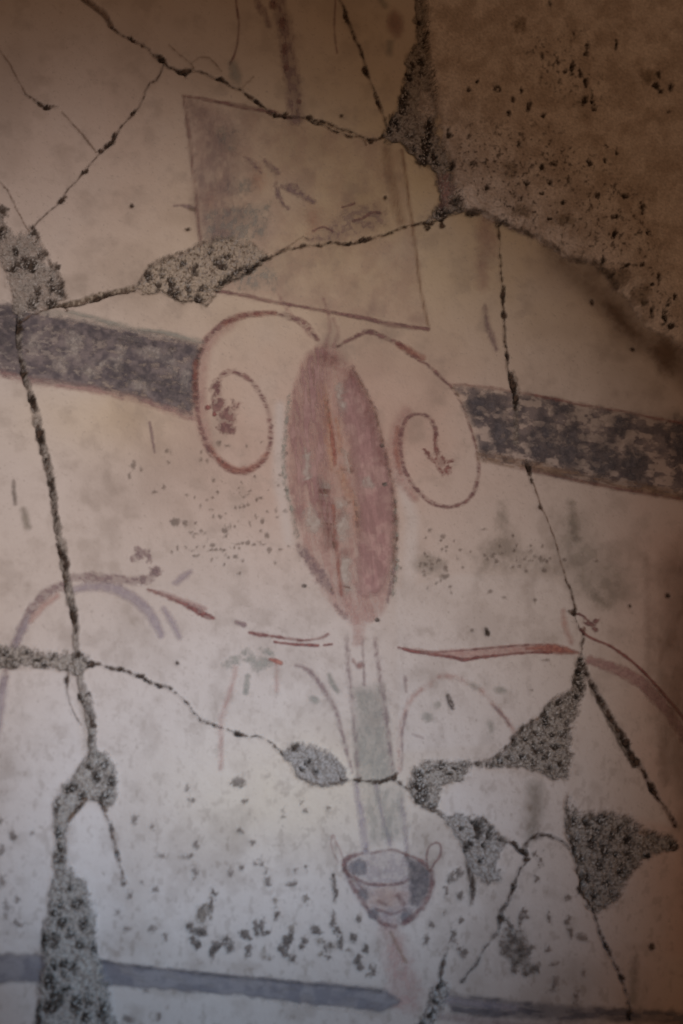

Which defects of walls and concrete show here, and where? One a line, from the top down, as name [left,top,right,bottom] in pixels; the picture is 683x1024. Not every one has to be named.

crack [83,0,385,143]
spalling [382,0,534,237]
spalling [134,237,267,303]
crack [261,216,447,262]
crack [498,231,558,549]
crack [16,287,283,767]
spalling [36,752,117,1024]
spalling [283,744,348,787]
spalling [409,658,587,900]
crack [440,834,568,983]
spalling [565,802,676,912]
crack [565,578,678,851]